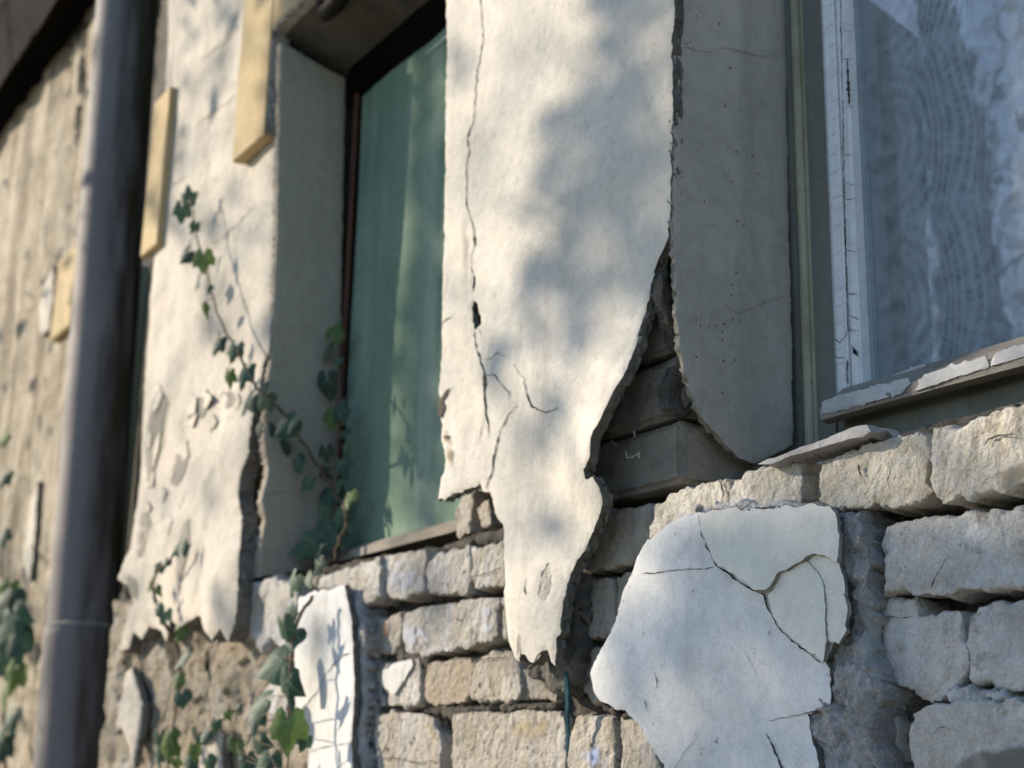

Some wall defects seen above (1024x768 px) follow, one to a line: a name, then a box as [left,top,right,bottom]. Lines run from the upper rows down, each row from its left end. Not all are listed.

crack [466,0,483,273]
flaking render [98,0,664,768]
crack [473,328,557,489]
flaking render [436,0,1024,768]
crack [767,705,828,768]